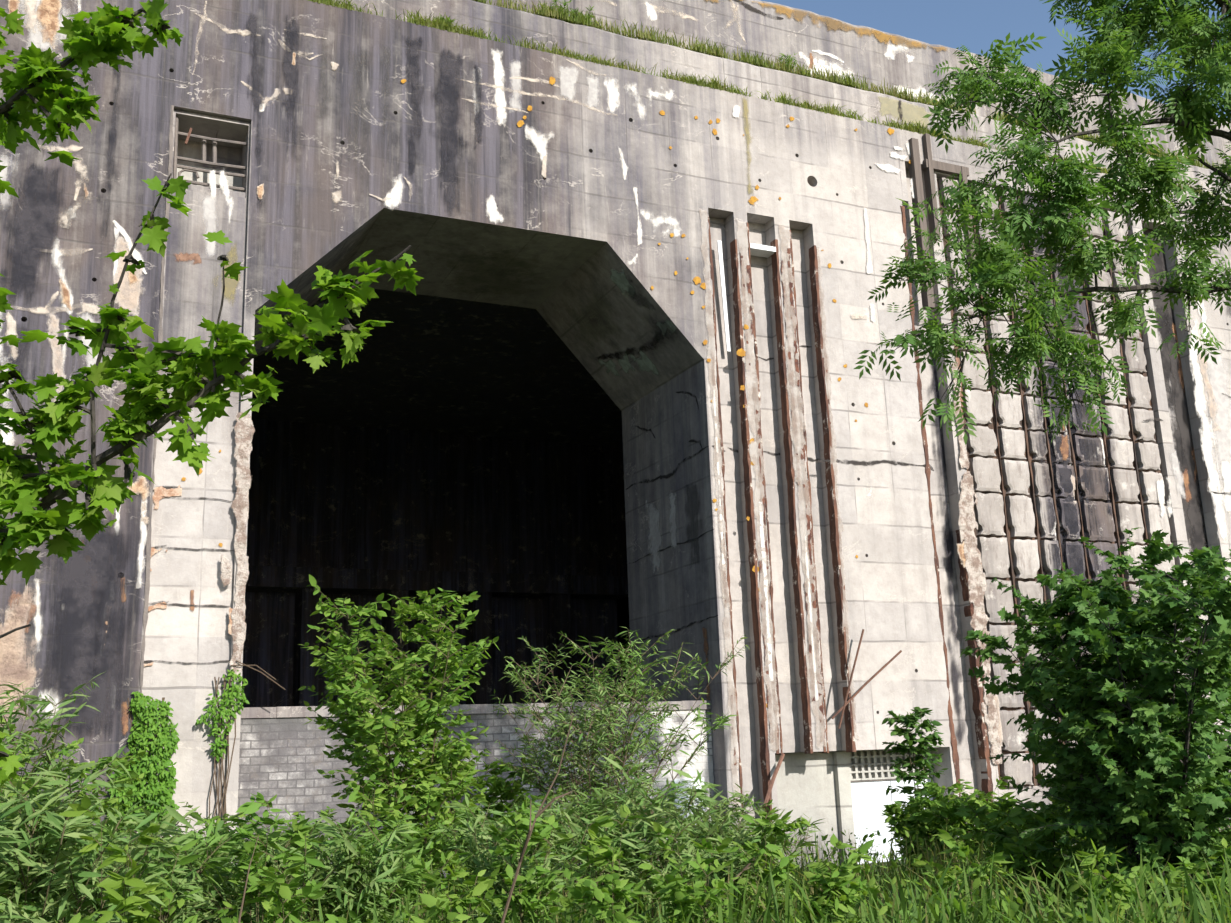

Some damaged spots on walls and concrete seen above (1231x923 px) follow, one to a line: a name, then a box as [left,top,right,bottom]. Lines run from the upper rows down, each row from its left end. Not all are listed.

spalling [8,0,67,50]
water stain [406,38,521,211]
crack [597,320,699,410]
spalling [0,579,41,727]
water stain [37,509,126,736]
spalling [220,412,255,681]
crack [626,440,934,490]
spalling [951,358,1003,765]